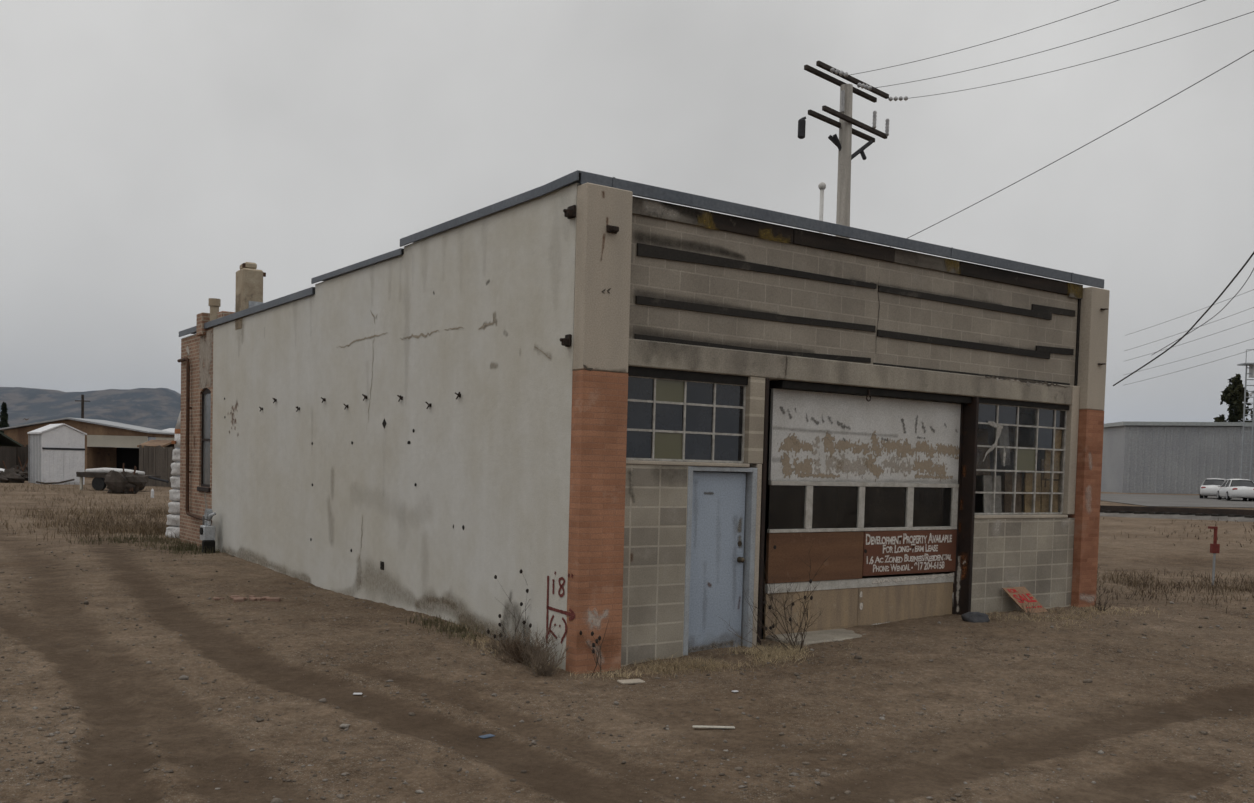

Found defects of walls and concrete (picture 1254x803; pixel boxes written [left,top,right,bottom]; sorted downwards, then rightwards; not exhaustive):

leakage [663,202,702,219]
crack [339,310,495,429]
peeling [778,407,966,481]